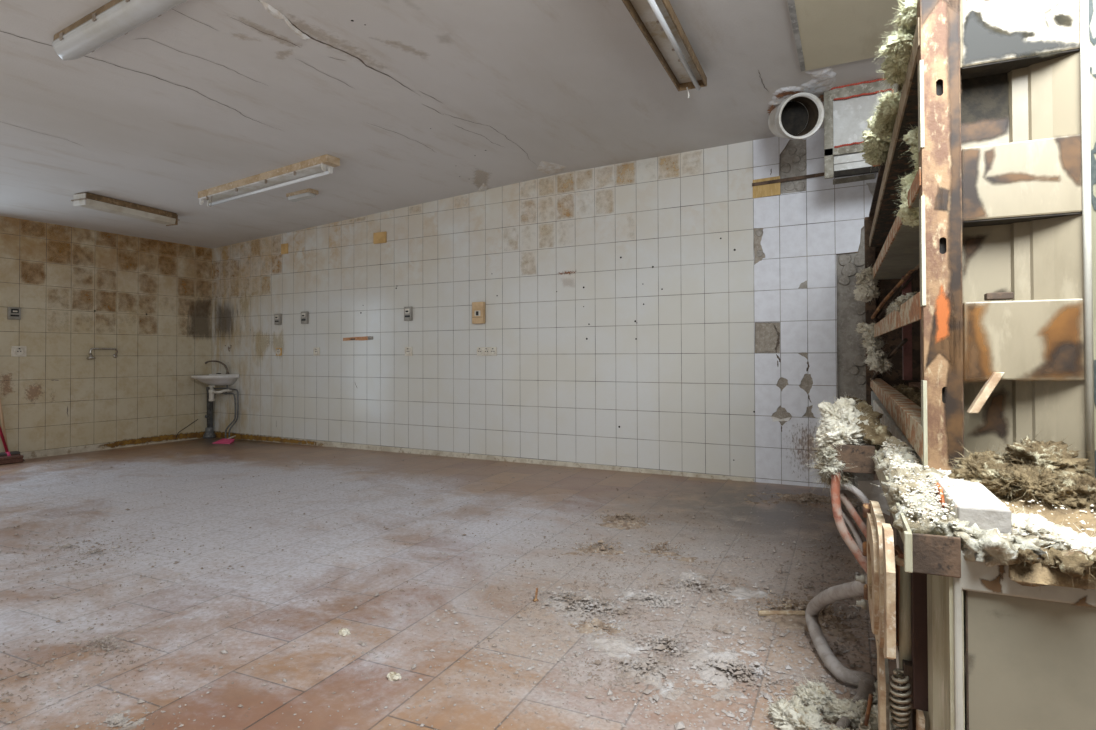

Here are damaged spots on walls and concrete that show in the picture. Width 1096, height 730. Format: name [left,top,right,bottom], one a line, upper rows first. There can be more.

crack [173,0,534,163]
spalling [754,228,765,265]
spalling [755,322,780,353]
spalling [771,374,816,426]
rust [792,427,819,469]